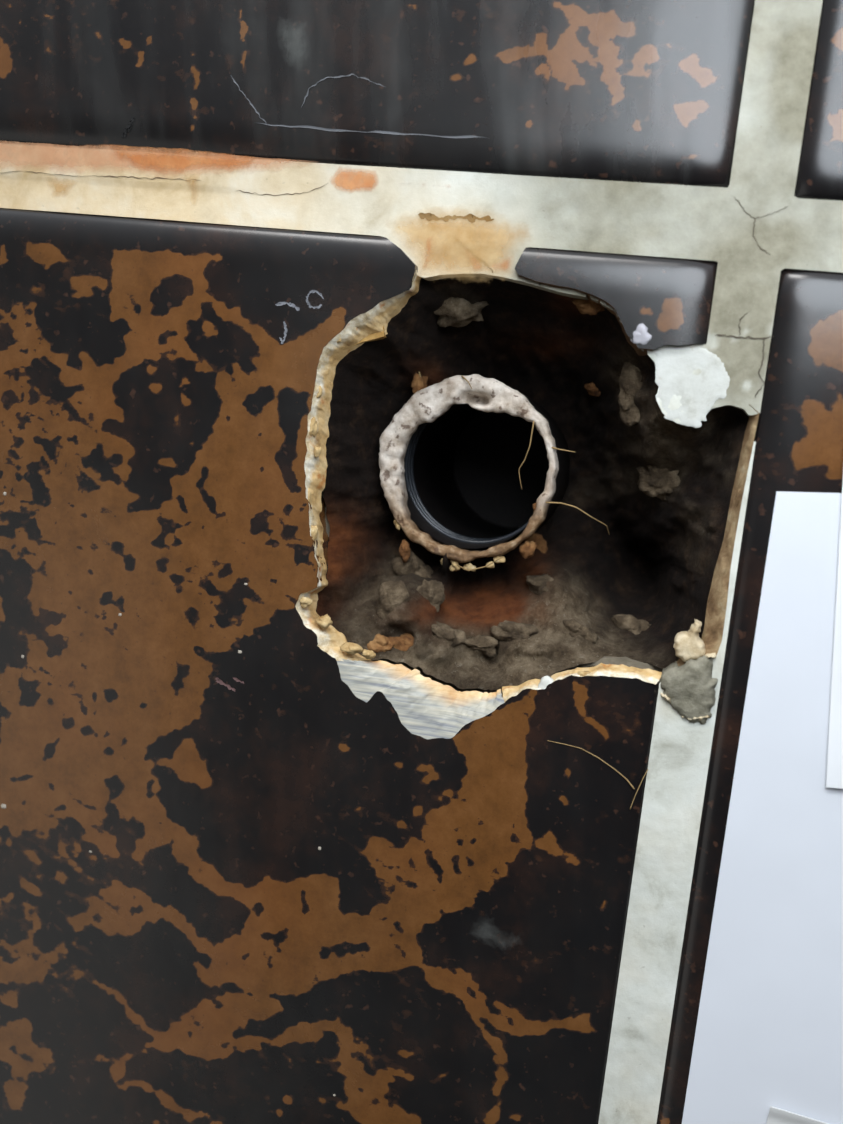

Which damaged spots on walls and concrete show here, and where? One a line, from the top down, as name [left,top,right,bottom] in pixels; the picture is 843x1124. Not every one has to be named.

rust [0,143,289,170]
spalling [295,270,759,739]